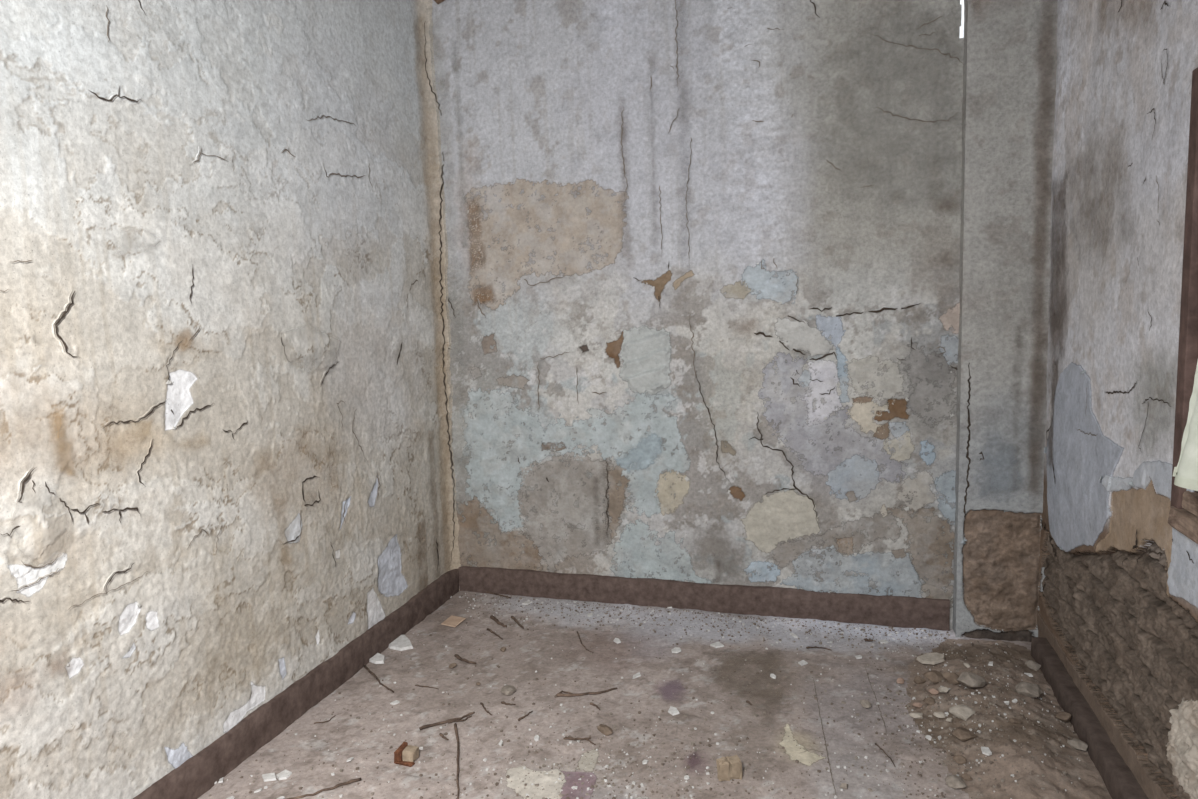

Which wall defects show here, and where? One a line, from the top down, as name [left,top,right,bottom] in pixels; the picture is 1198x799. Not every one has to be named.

crack [86,86,141,102]
peeling [465,179,629,310]
peeling [7,553,67,597]
crack [0,264,248,610]
peeling [165,369,197,430]
crack [407,152,487,570]
peeling [460,325,712,584]
crack [750,411,820,527]
crack [754,258,920,395]
crack [897,337,985,537]
spalling [721,259,1198,799]
peeling [223,682,266,733]